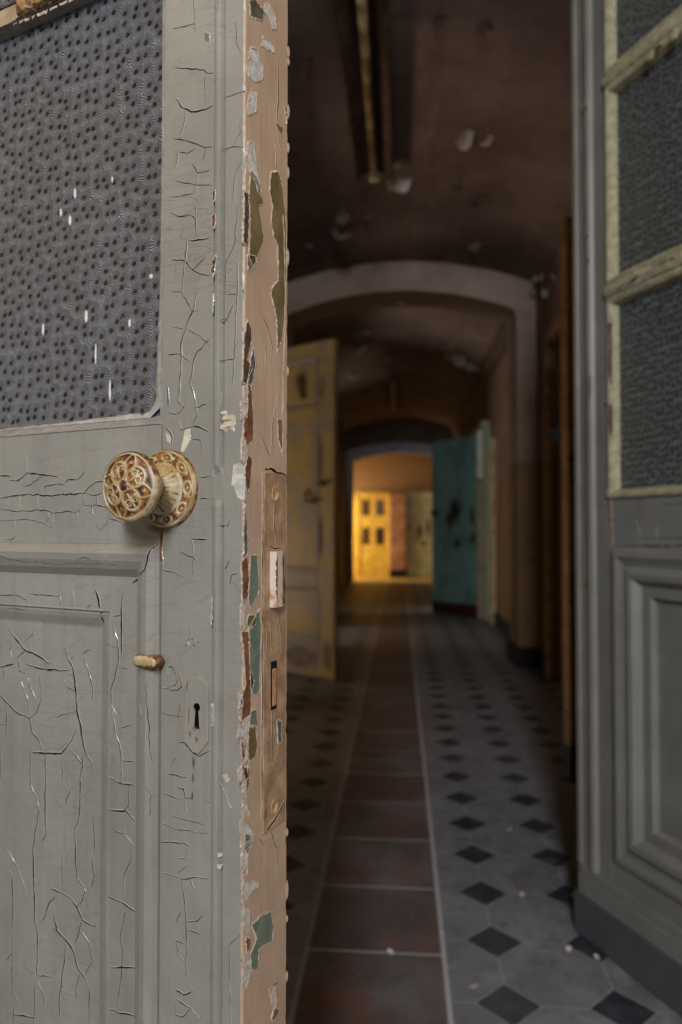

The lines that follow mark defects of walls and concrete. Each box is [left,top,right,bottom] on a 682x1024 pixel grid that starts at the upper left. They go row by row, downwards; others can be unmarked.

peeling [245,0,277,117]
peeling [275,103,290,153]
peeling [385,177,412,193]
peeling [456,129,493,151]
crack [165,67,246,499]
peeling [241,141,289,354]
peeling [219,319,288,991]
crack [0,457,232,1024]
peeling [268,971,288,1022]